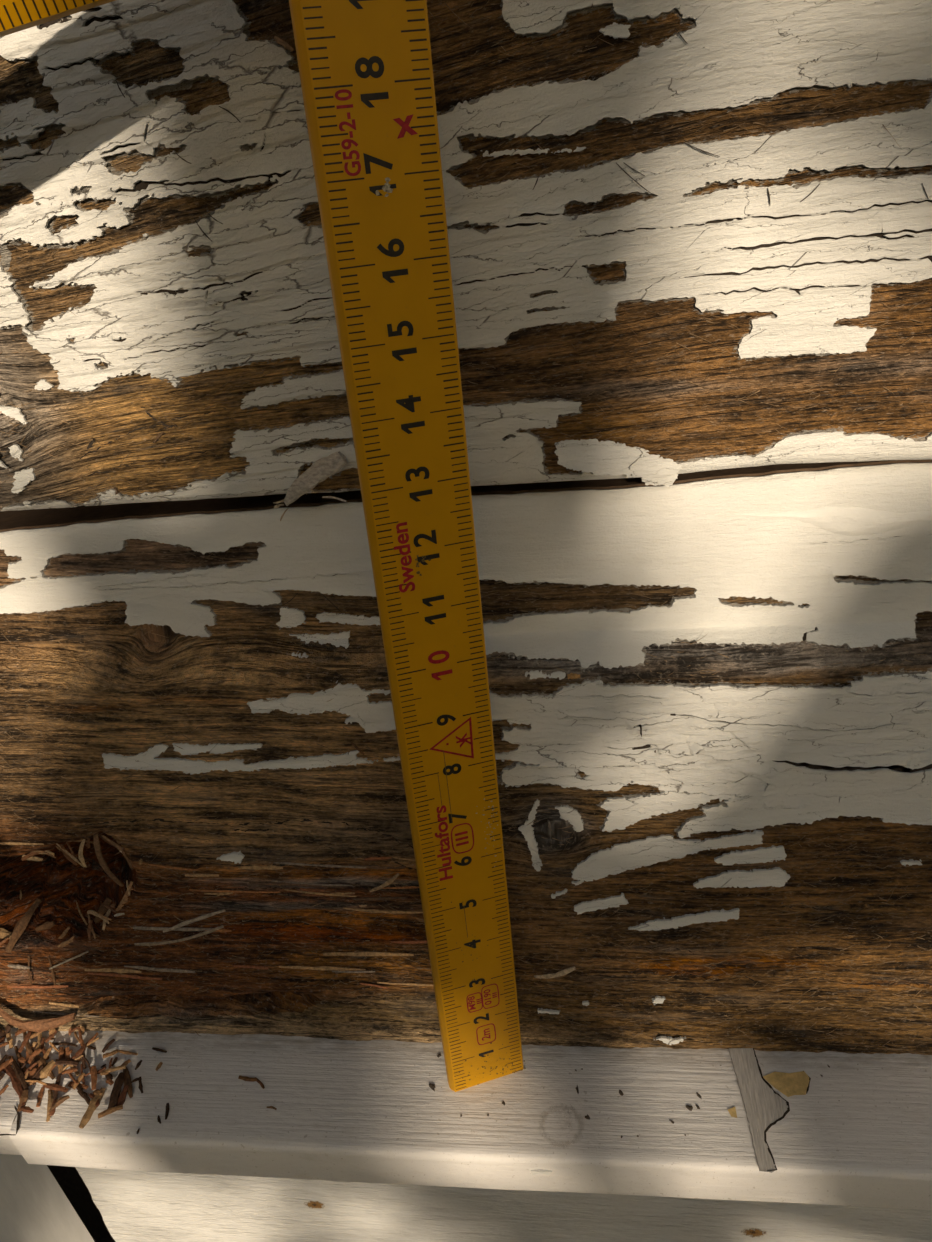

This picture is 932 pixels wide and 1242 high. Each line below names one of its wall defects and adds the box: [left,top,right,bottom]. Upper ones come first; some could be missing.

crack [39,7,123,30]
crack [104,127,148,158]
crack [112,110,300,193]
peeling [446,79,932,189]
crack [456,200,932,295]
crack [85,270,266,367]
peeling [0,144,361,511]
peeling [458,278,932,488]
peeling [486,611,932,697]
peeling [0,590,442,1043]
crack [767,760,932,785]
peeling [492,719,932,1173]